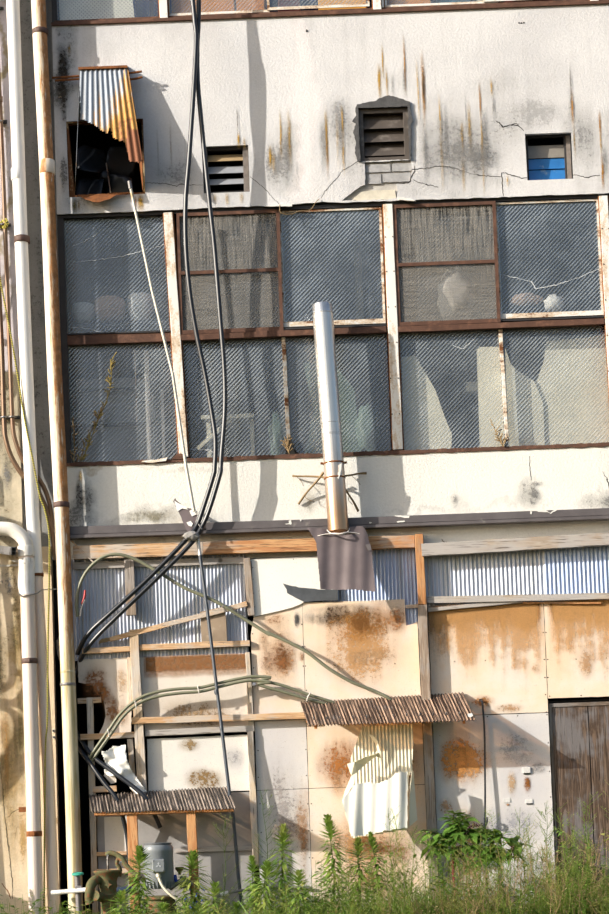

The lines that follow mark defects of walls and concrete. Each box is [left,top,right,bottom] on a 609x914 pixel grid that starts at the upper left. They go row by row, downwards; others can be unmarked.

corrosion [417,67,425,112]
corrosion [269,120,291,165]
spalling [343,160,415,201]
crack [396,166,527,195]